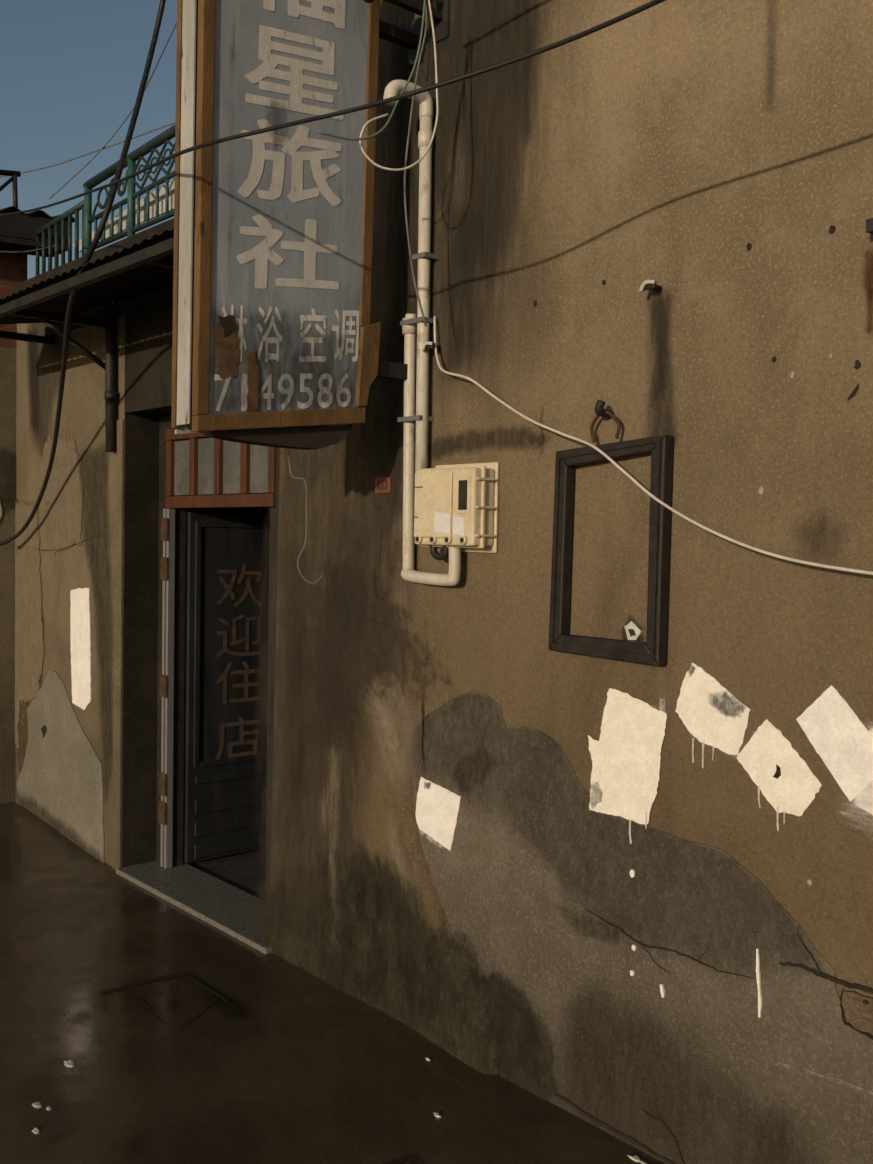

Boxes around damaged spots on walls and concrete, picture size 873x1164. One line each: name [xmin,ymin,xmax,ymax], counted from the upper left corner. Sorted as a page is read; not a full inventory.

water stain [379,0,536,365]
rust [865,253,873,331]
water stain [651,297,673,437]
water stain [259,378,555,1100]
crack [588,911,750,978]
crack [780,933,873,1040]
flaking render [843,990,873,1034]